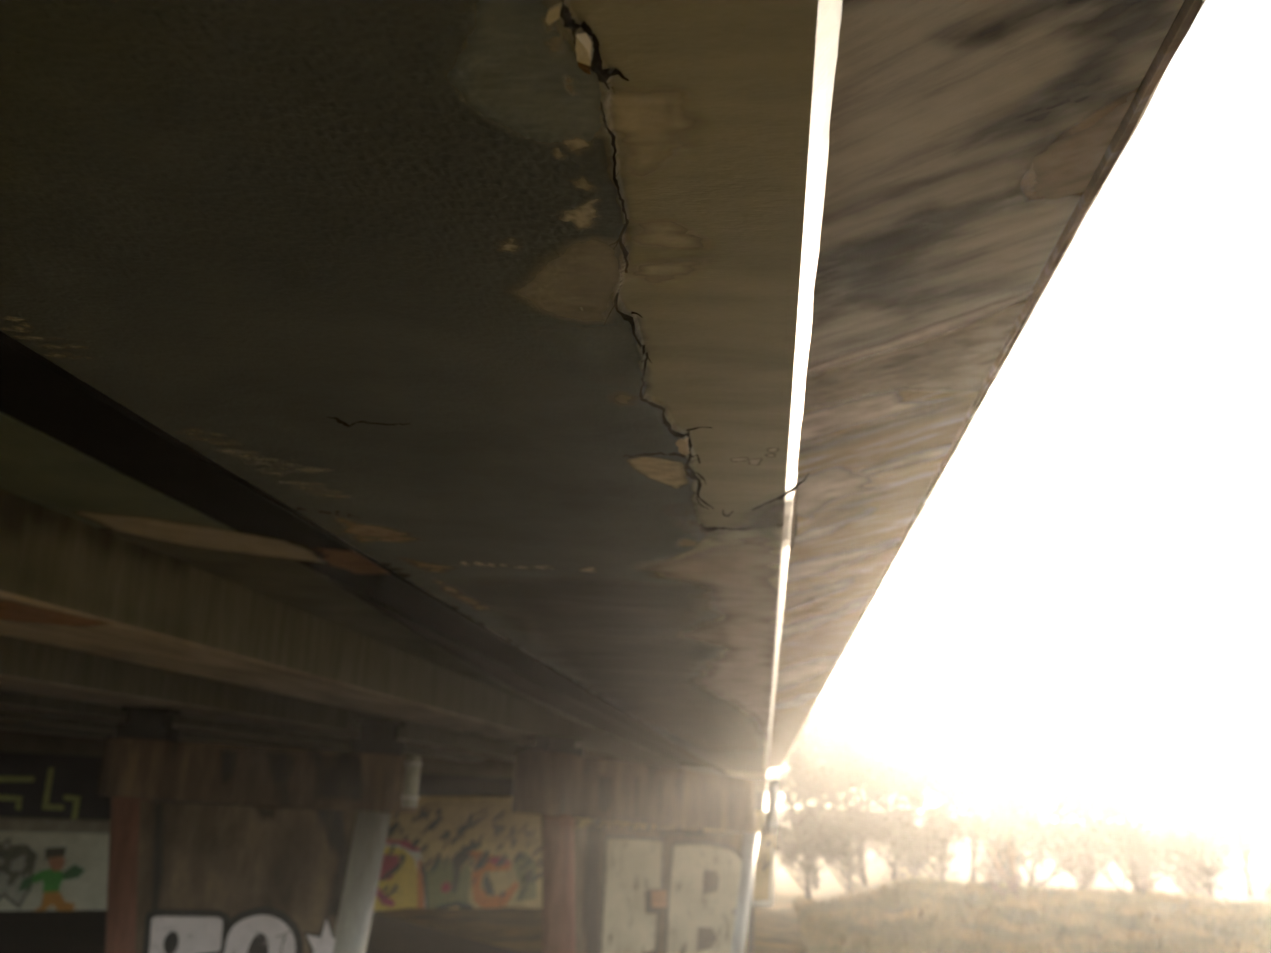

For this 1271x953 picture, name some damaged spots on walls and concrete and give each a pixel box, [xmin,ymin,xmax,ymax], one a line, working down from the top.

crack [546,0,809,532]
spalling [628,457,686,488]
spalling [790,476,798,550]